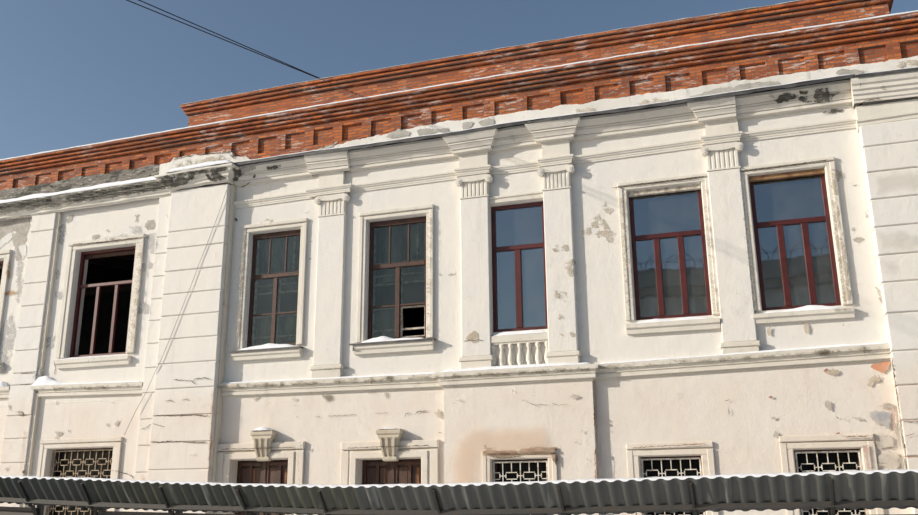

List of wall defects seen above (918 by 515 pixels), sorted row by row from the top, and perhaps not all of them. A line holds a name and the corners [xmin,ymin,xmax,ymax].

spalling [690,81,844,115]
peeling [0,215,31,302]
peeling [92,214,157,353]
peeling [582,194,632,316]
peeling [0,315,15,374]
spalling [868,361,891,386]
crack [143,377,293,450]
peeling [825,401,906,470]
crack [891,357,918,469]